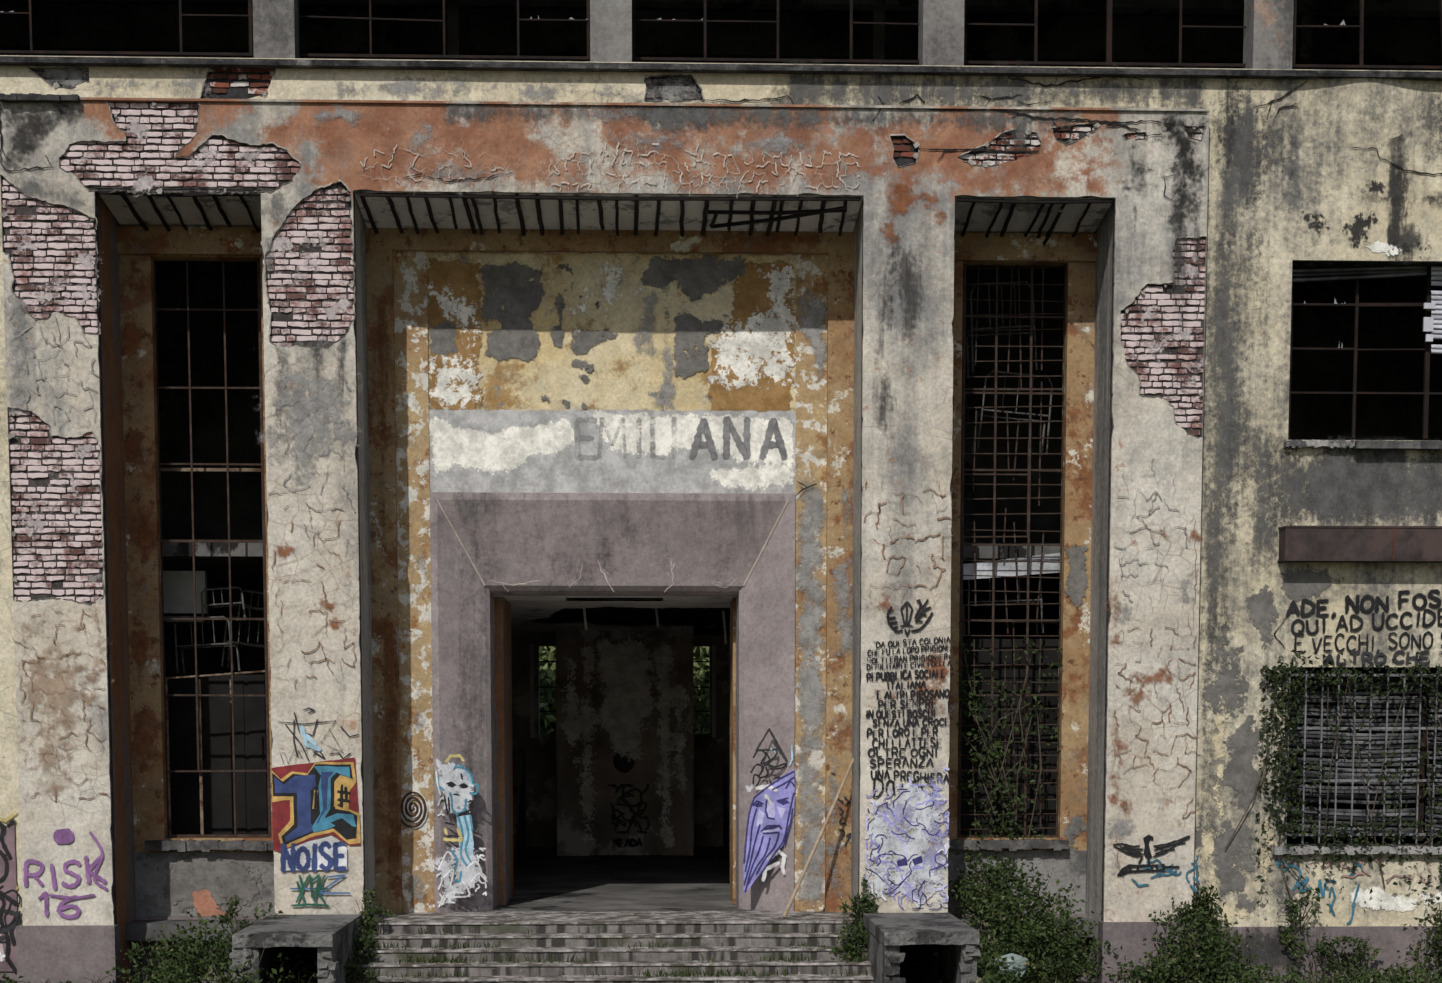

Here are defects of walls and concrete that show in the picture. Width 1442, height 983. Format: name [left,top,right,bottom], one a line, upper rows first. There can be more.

spalling [1,175,105,606]
spalling [27,66,90,90]
spalling [58,68,302,197]
spalling [261,180,356,348]
peeling [313,103,358,126]
water stain [337,64,1442,830]
rust [880,183,1113,245]
spalling [958,122,1100,167]
spalling [1119,236,1207,439]
peeling [427,254,853,901]
rust [383,625,400,862]